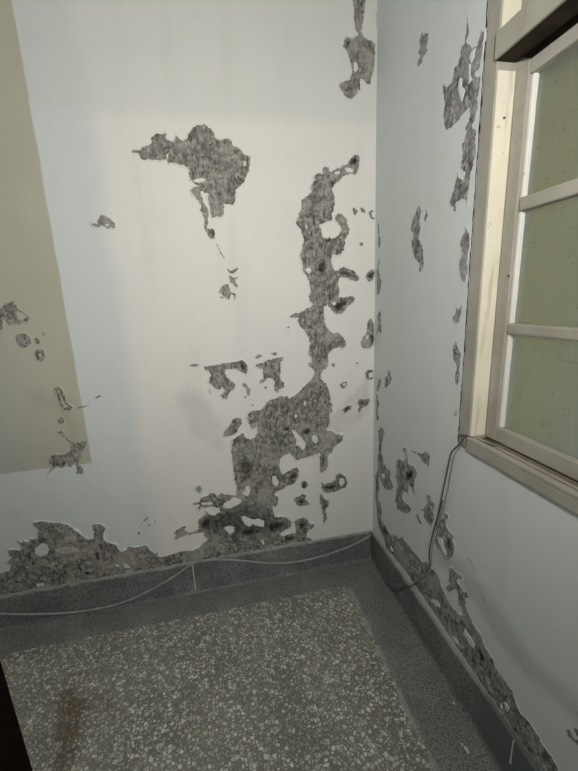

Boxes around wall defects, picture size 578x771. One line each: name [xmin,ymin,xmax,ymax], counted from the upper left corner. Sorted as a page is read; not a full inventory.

spalling [337,0,376,101]
peeling [442,15,487,213]
spalling [131,122,252,258]
peeling [410,204,428,274]
spalling [0,154,375,595]
peeling [452,340,462,387]
spalling [374,426,560,771]